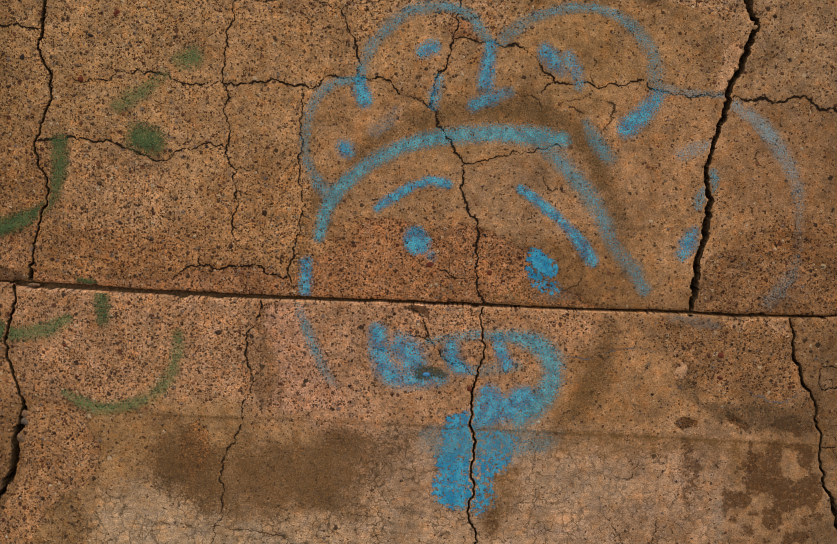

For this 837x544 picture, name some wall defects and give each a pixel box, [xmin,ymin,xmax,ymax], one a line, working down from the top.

crack [0,0,402,296]
crack [0,283,31,503]
crack [164,300,291,544]
leakage [150,426,408,522]
crack [406,0,837,544]